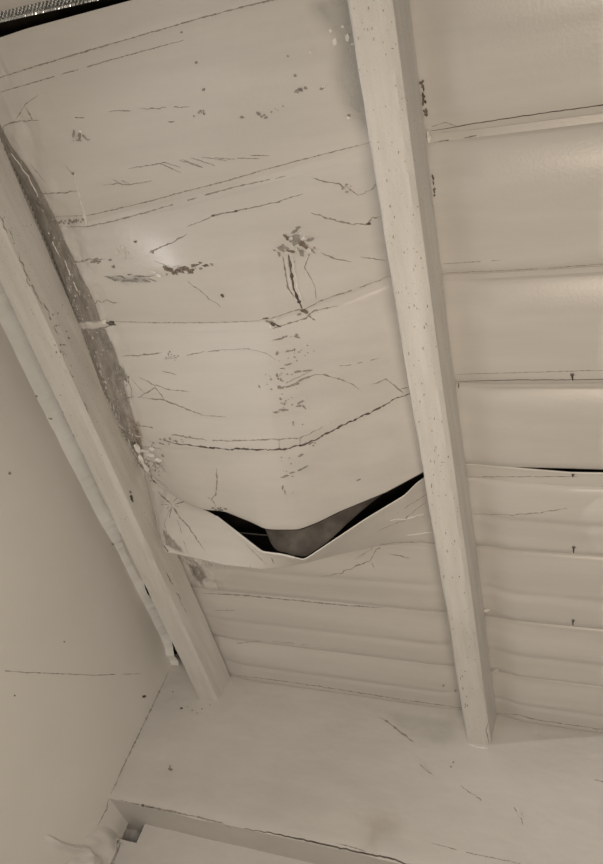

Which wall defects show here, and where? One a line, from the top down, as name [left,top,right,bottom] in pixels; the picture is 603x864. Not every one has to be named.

crack [57,142,378,254]
peeling [273,226,315,262]
crack [0,217,74,377]
crack [91,253,390,329]
crack [123,348,275,417]
crack [134,358,410,511]
peeling [164,531,212,582]
crack [5,669,115,677]
crack [237,675,460,708]
crack [97,674,406,864]
crack [432,843,520,864]